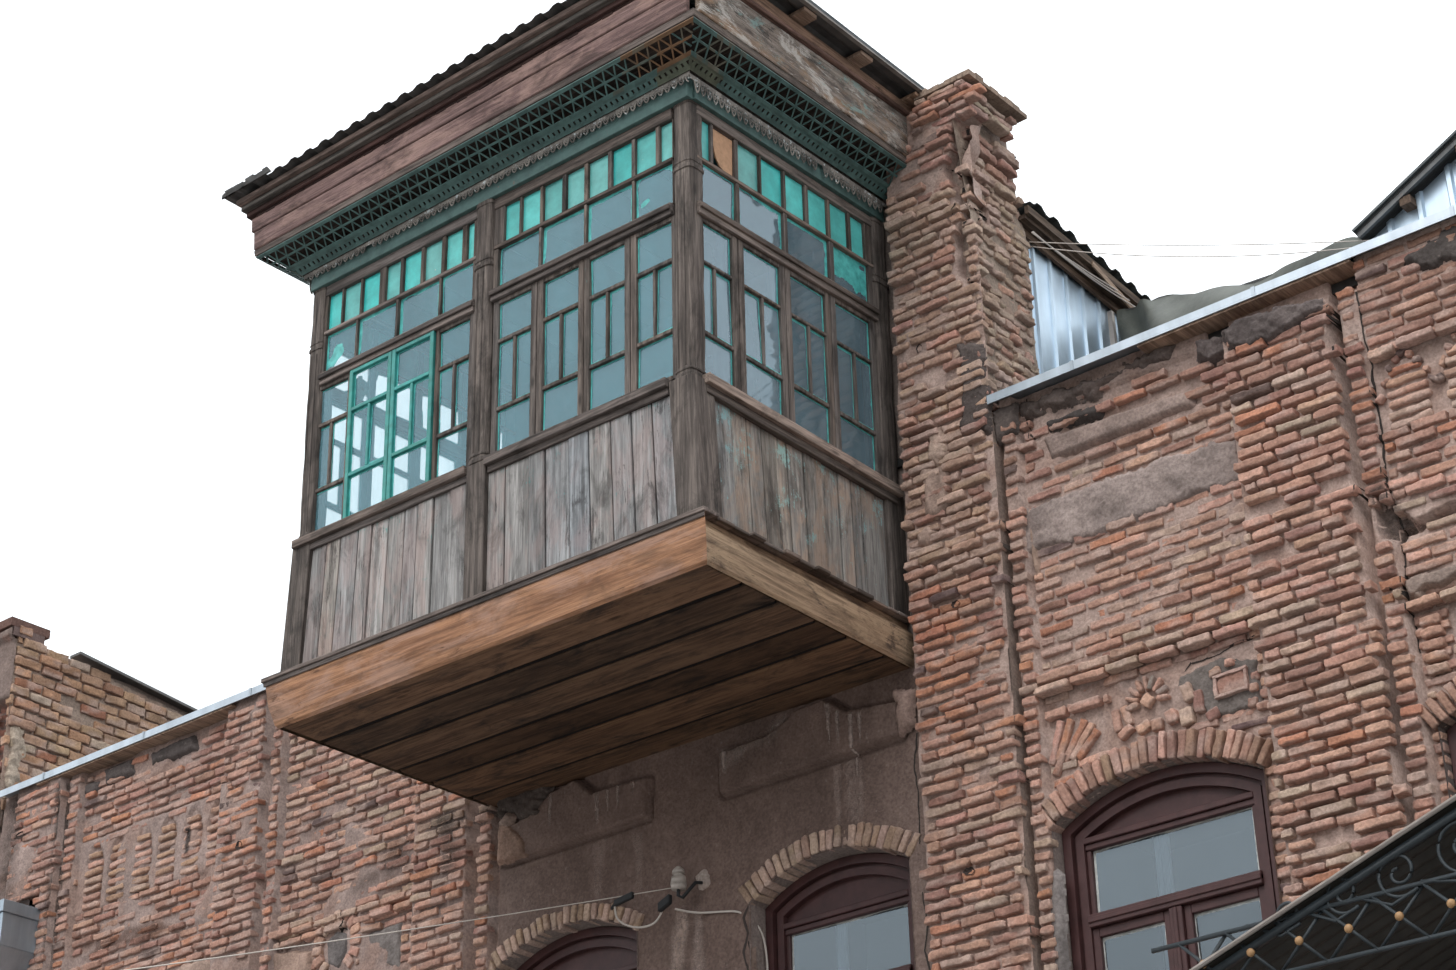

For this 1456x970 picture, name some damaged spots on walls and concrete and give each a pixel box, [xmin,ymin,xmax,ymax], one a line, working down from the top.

crack [1326,292,1421,653]